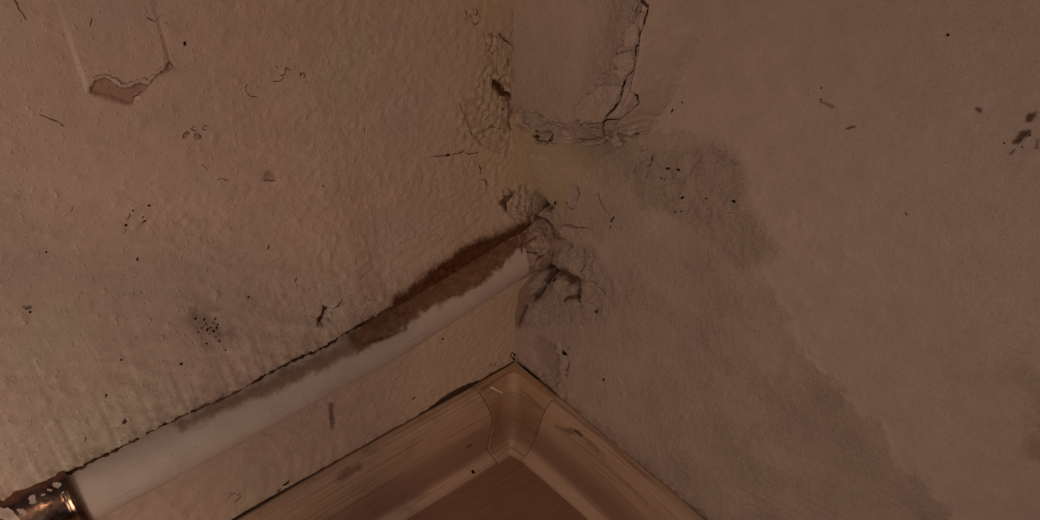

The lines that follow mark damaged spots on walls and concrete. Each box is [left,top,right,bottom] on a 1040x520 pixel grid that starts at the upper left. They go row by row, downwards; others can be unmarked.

peeling [90,62,174,105]
flaking render [518,0,645,146]
crack [602,0,649,143]